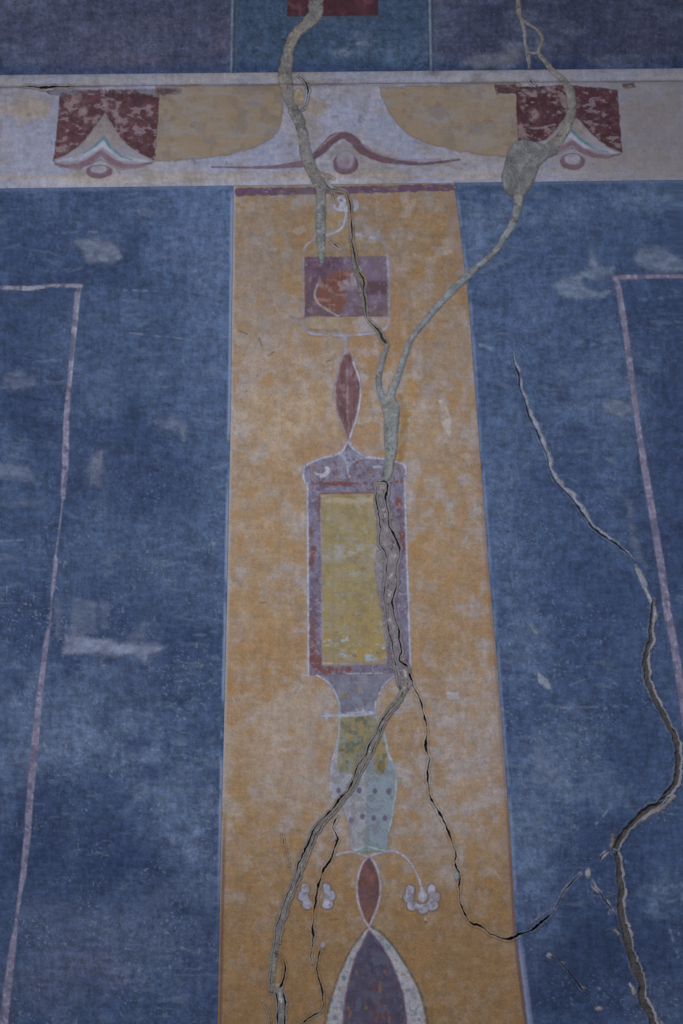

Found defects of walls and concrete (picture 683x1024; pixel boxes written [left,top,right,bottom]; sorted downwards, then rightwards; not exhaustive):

crack [262,0,683,1024]